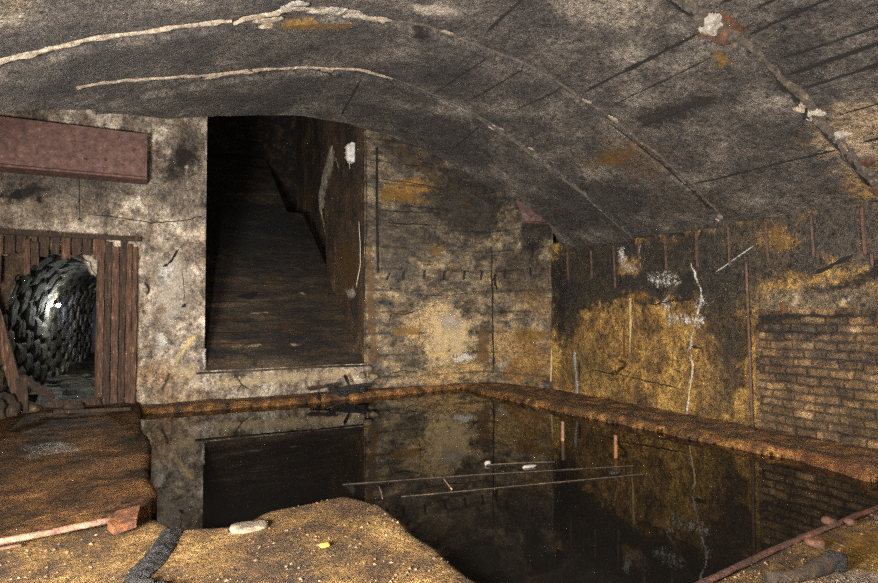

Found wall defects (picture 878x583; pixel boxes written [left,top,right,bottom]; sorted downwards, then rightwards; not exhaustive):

peeling [697,12,730,46]
peeling [792,102,827,121]